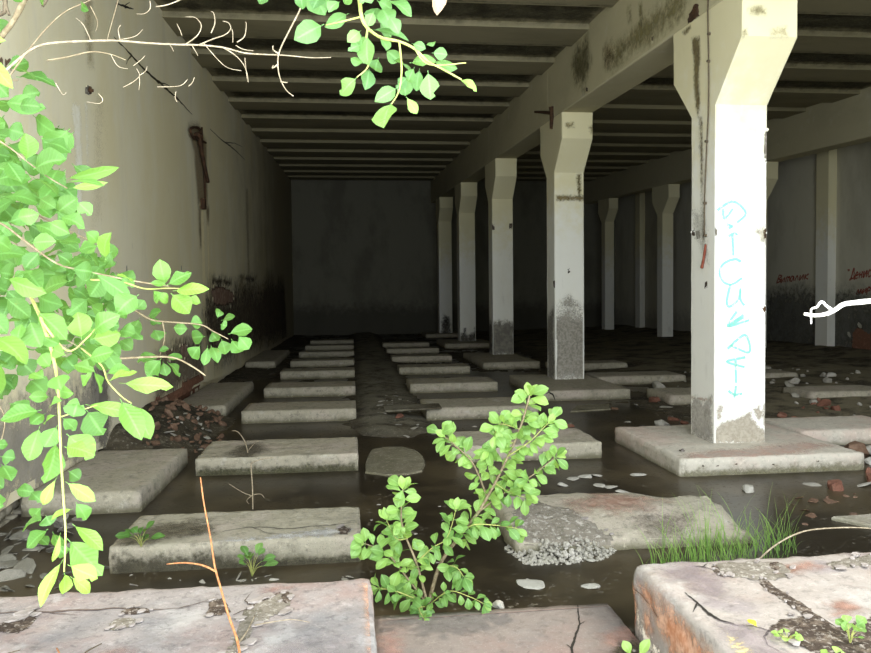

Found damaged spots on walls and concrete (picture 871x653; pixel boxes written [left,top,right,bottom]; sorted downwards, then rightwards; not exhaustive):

water stain [610,0,685,66]
crack [114,37,192,114]
corrosion [192,129,209,220]
water stain [489,321,513,355]
water stain [547,297,583,379]
spalling [826,552,871,570]
spalling [104,604,153,631]
spalling [204,590,295,653]
crack [381,605,603,653]
crack [685,592,779,651]
spalling [712,558,871,653]